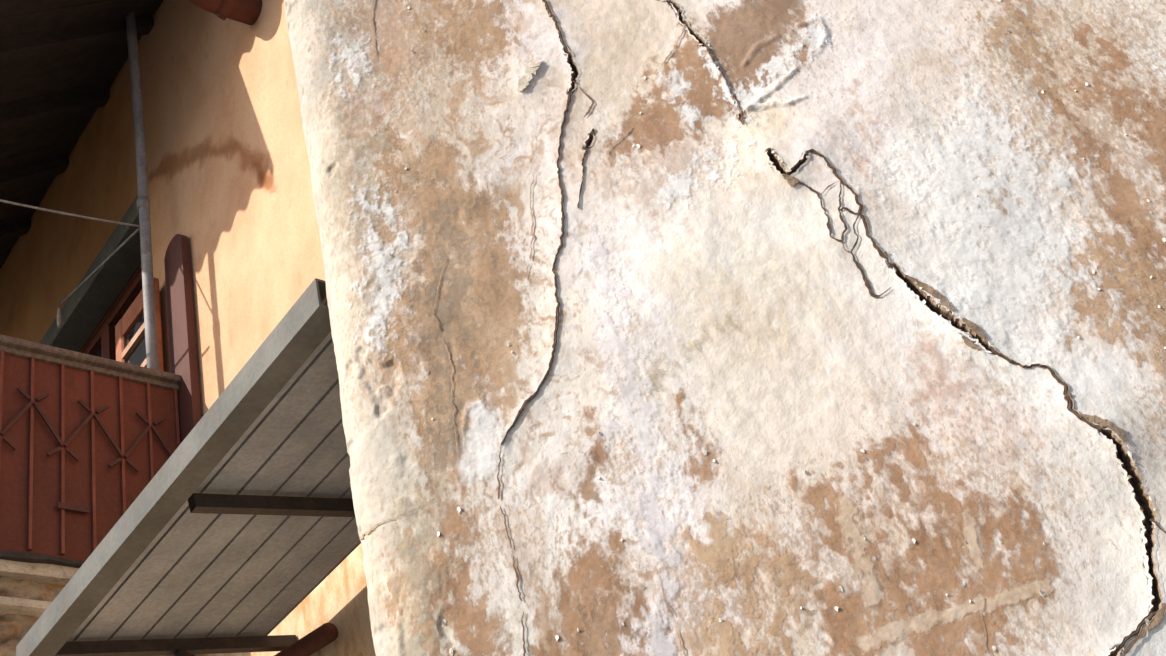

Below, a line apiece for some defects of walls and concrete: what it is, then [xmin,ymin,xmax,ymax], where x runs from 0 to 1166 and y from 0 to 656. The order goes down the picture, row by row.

peeling [368,127,535,656]
crack [497,0,596,656]
crack [654,0,746,125]
peeling [607,0,827,166]
peeling [680,422,1060,656]
crack [764,148,1166,656]
peeling [976,0,1166,373]